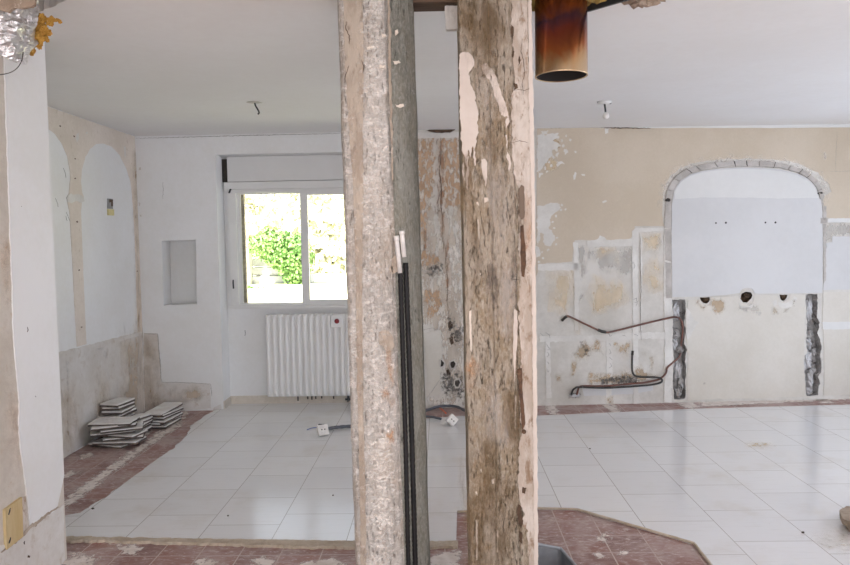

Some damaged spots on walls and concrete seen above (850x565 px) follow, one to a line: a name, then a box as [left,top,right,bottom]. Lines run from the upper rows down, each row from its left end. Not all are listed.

peeling [536,130,577,178]
peeling [535,203,566,263]
water stain [426,243,449,288]
water stain [447,316,464,345]
water stain [440,370,465,398]